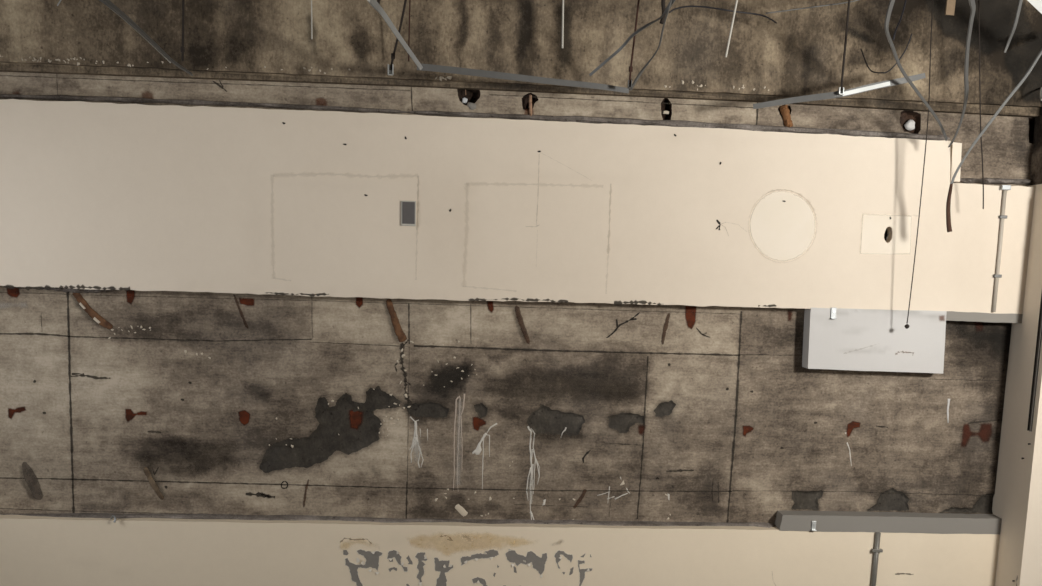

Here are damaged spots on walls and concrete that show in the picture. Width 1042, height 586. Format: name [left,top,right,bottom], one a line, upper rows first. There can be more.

corrosion [8,407,26,419]
corrosion [125,409,147,422]
damp [409,416,428,468]
damp [431,367,468,492]
corrosion [473,417,486,431]
corrosion [847,421,860,437]
corrosion [961,424,992,447]
damp [480,423,497,489]
damp [526,426,540,520]
spalling [791,490,823,511]
spalling [866,488,910,511]
peeling [343,549,593,586]